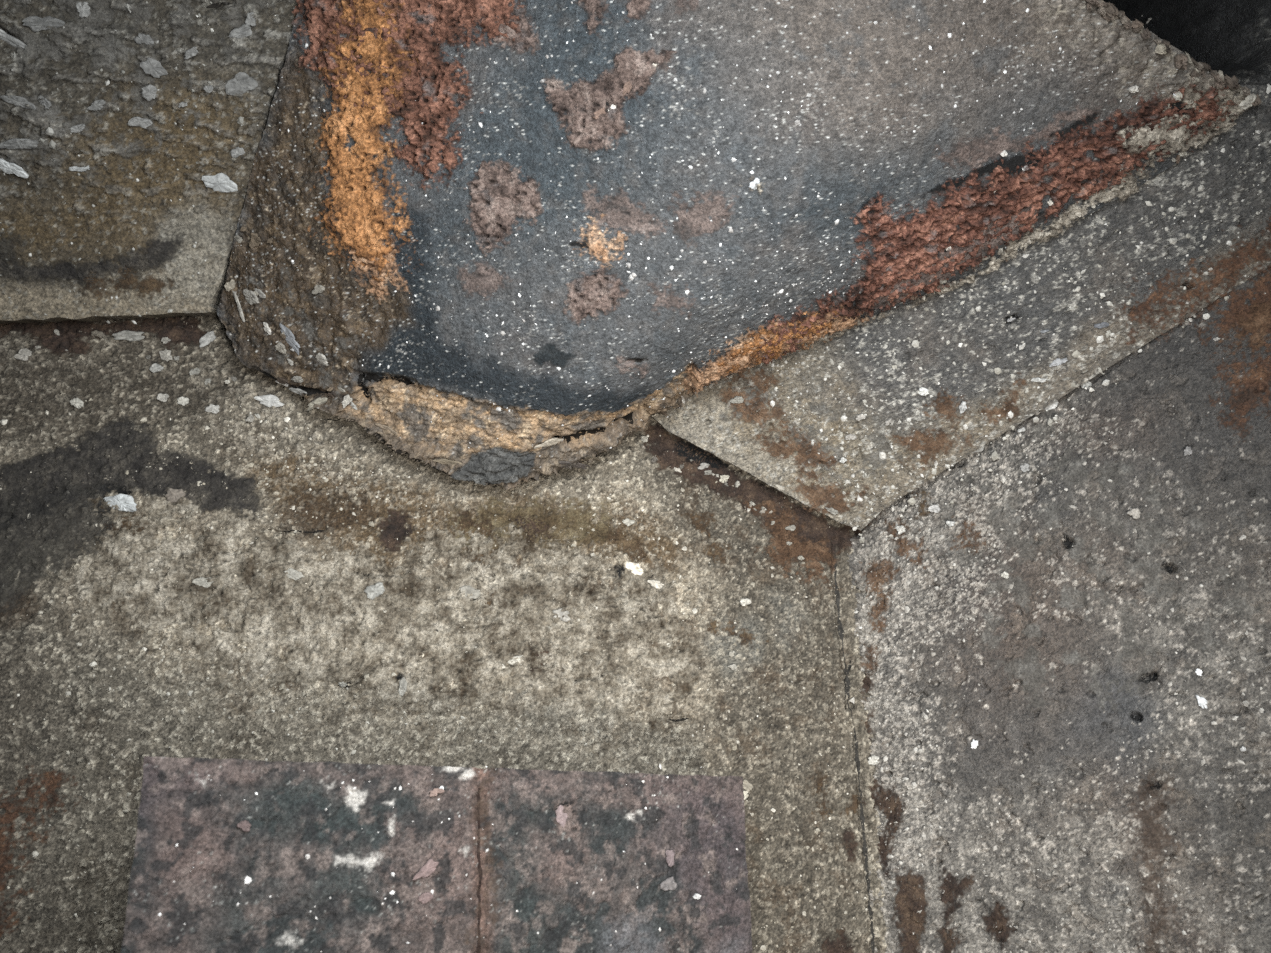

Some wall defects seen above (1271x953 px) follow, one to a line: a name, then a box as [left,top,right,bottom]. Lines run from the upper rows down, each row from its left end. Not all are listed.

rust [291,0,522,300]
rust [570,214,627,266]
rust [681,84,1238,398]
rust [1123,217,1271,436]
damp [0,417,262,611]
rust [641,423,854,583]